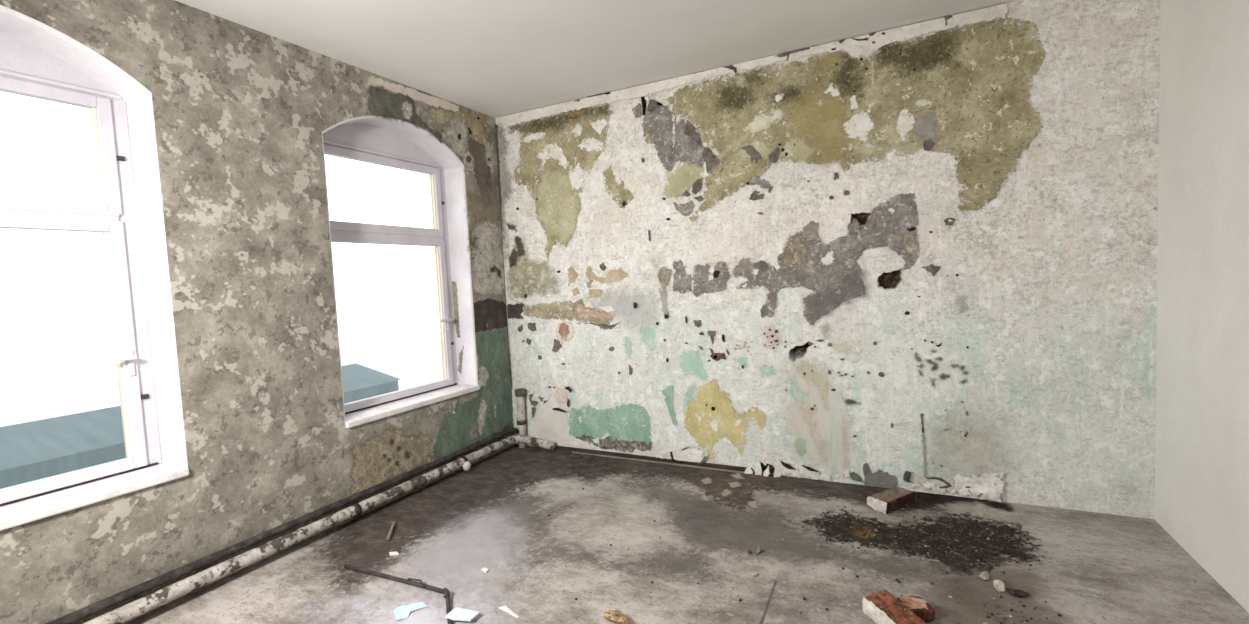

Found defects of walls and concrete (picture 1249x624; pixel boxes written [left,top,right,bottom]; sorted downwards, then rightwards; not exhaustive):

peeling [350,3,1046,502]